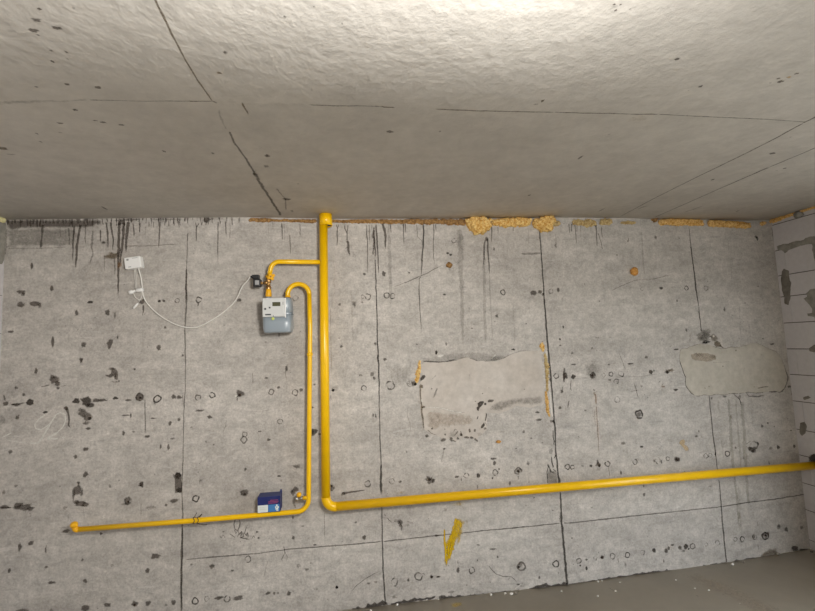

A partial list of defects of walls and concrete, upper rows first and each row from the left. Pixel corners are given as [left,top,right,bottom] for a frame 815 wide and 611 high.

damp [7,217,240,291]